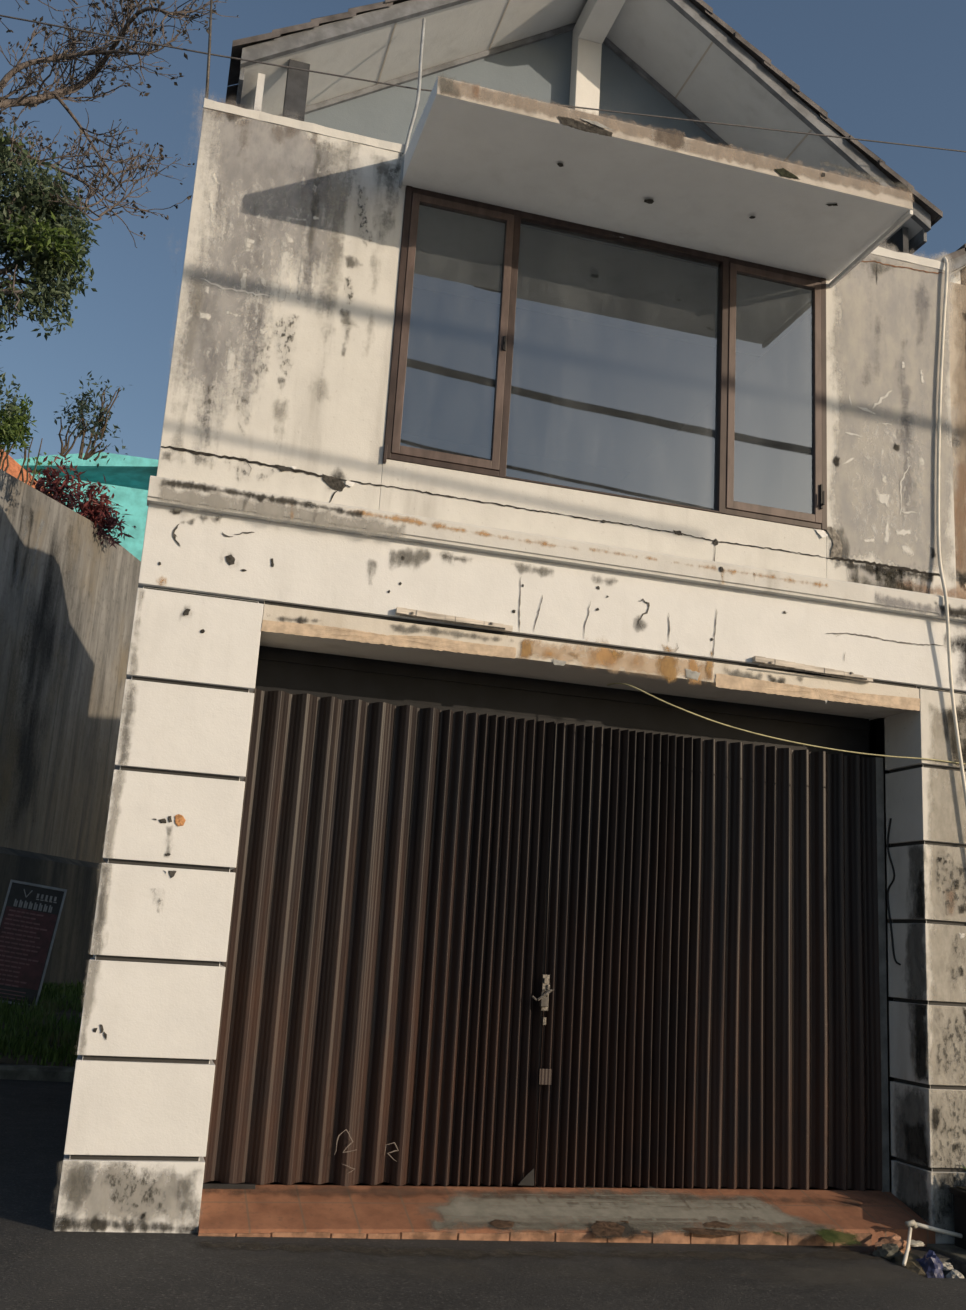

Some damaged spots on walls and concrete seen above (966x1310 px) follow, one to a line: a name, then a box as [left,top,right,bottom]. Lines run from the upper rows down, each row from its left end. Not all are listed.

spalling [557,116,613,137]
spalling [775,168,800,180]
damp [179,104,368,423]
damp [833,246,966,617]
damp [161,481,466,565]
rust [362,511,490,536]
crack [161,446,966,590]
peeling [261,617,920,711]
damp [895,697,966,1234]
damp [55,1162,197,1234]
spalling [588,1221,651,1239]
spalling [682,1221,751,1236]